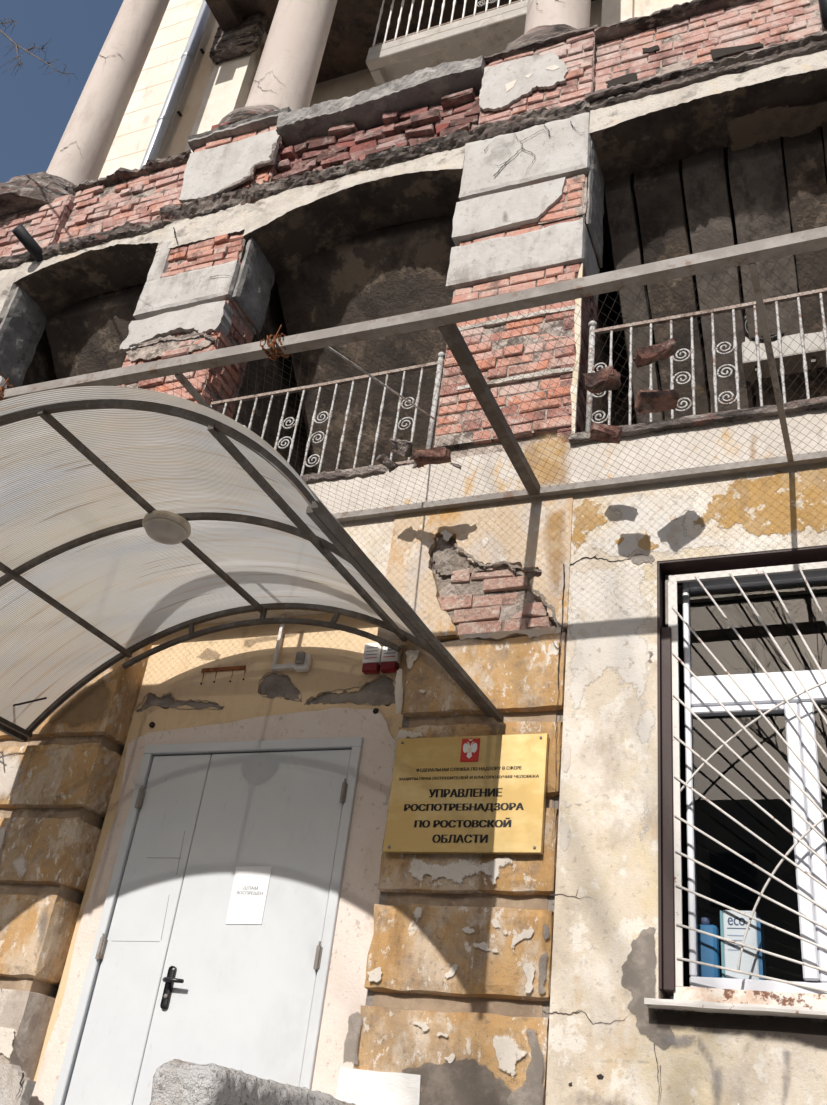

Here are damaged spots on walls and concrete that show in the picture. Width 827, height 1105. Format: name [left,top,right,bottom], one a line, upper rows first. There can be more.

spalling [711,42,764,59]
spalling [605,73,637,88]
crack [484,121,583,181]
peeling [431,467,827,743]
flaking render [258,650,419,714]
flaking render [136,693,224,712]
peeling [408,856,512,885]
peeling [491,918,550,953]
peeling [367,967,382,982]
peeling [523,962,535,993]
crack [543,1010,634,1025]
peeling [0,1027,14,1058]